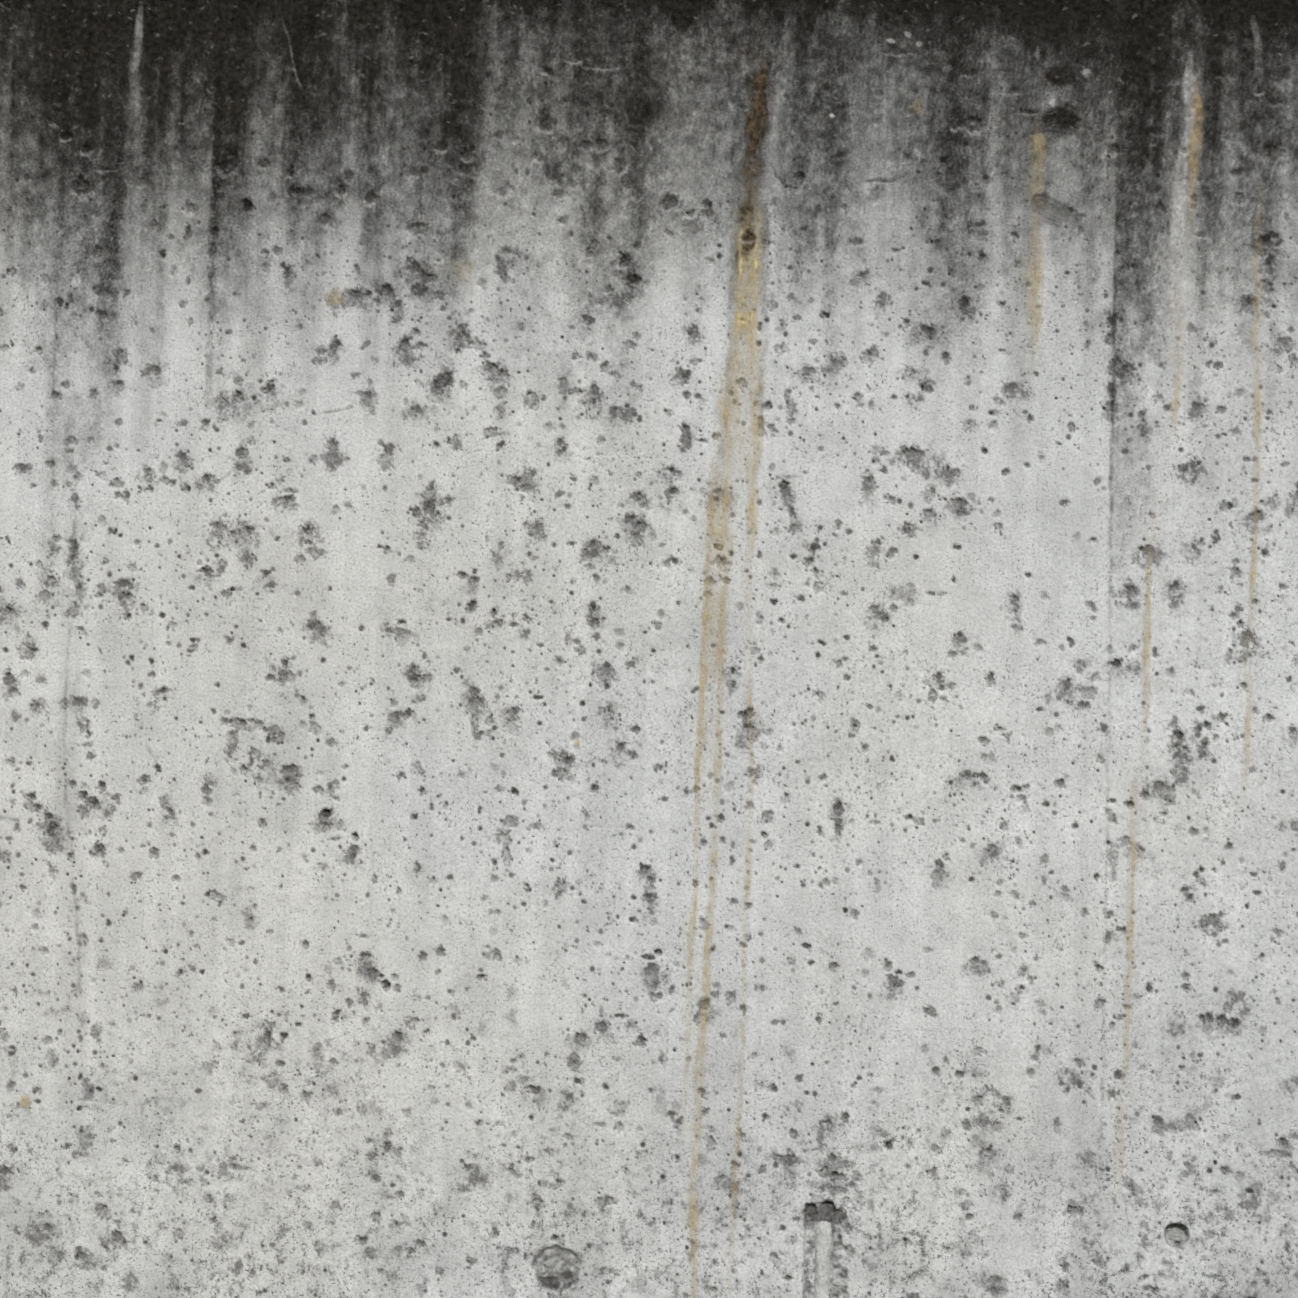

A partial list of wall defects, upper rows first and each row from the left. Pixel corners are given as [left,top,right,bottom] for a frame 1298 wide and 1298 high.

damp [0,0,1298,319]
corrosion [734,65,768,351]
spalling [461,569,528,626]
spalling [642,949,674,997]
spalling [243,1014,301,1088]